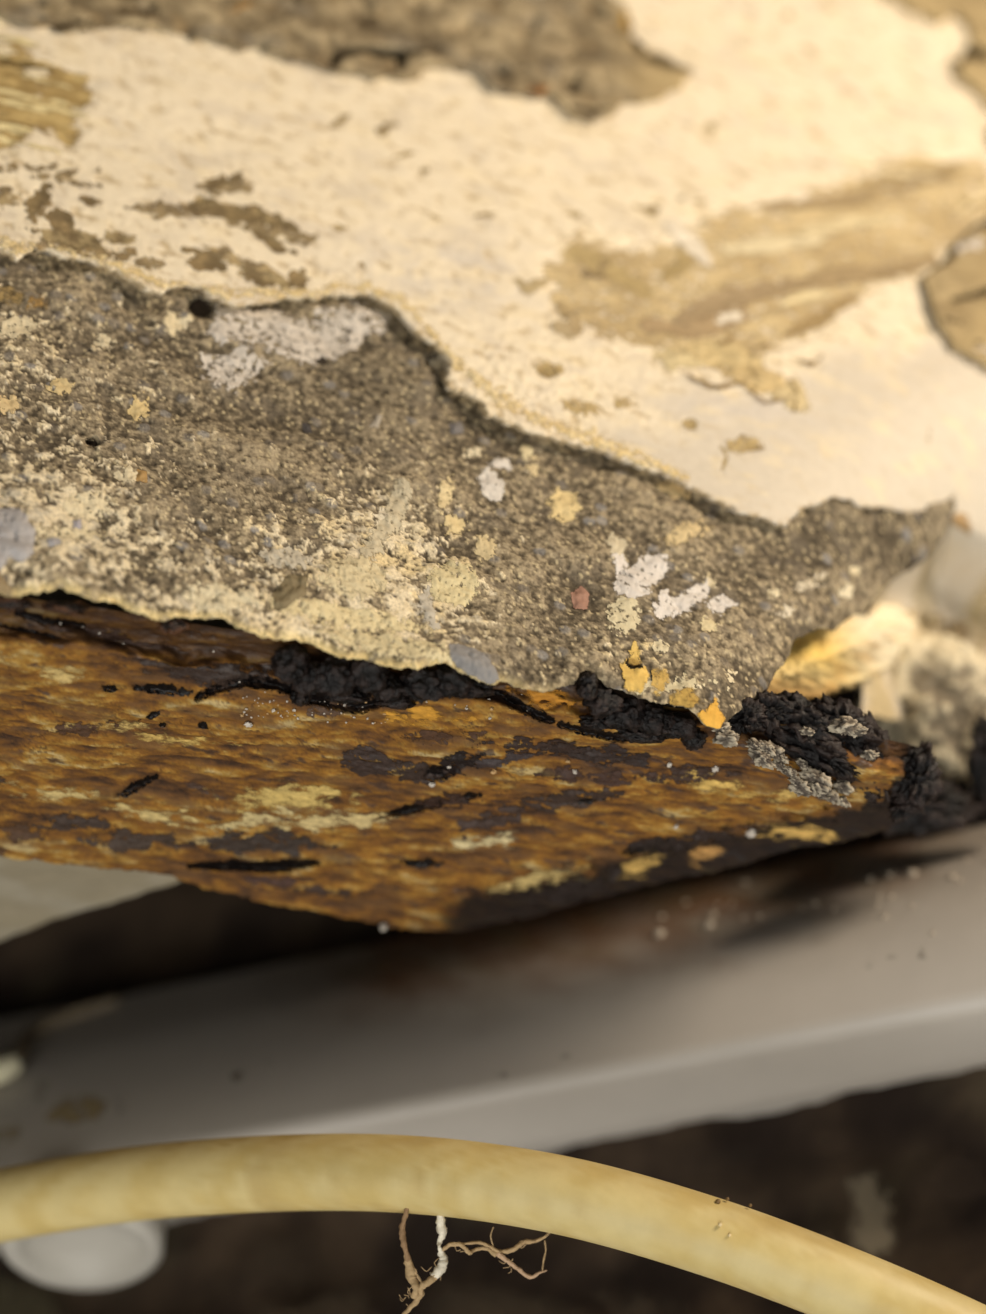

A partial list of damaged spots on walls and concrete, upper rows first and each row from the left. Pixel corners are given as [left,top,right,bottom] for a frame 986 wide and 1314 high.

peeling [0,0,986,744]
corrosion [0,595,92,616]
corrosion [157,617,191,636]
corrosion [270,643,495,710]
corrosion [340,641,986,993]